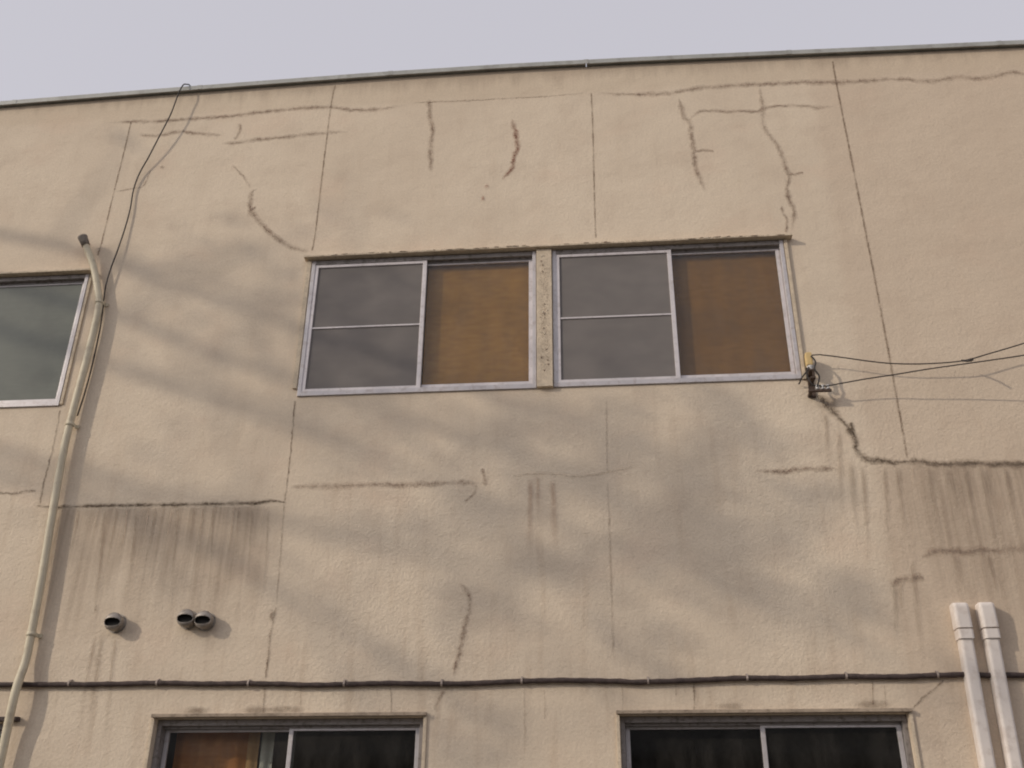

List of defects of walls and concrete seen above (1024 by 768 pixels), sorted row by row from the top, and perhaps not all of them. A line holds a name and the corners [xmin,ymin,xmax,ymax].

crack [505,130,519,176]
crack [821,397,1024,467]
crack [31,490,281,508]